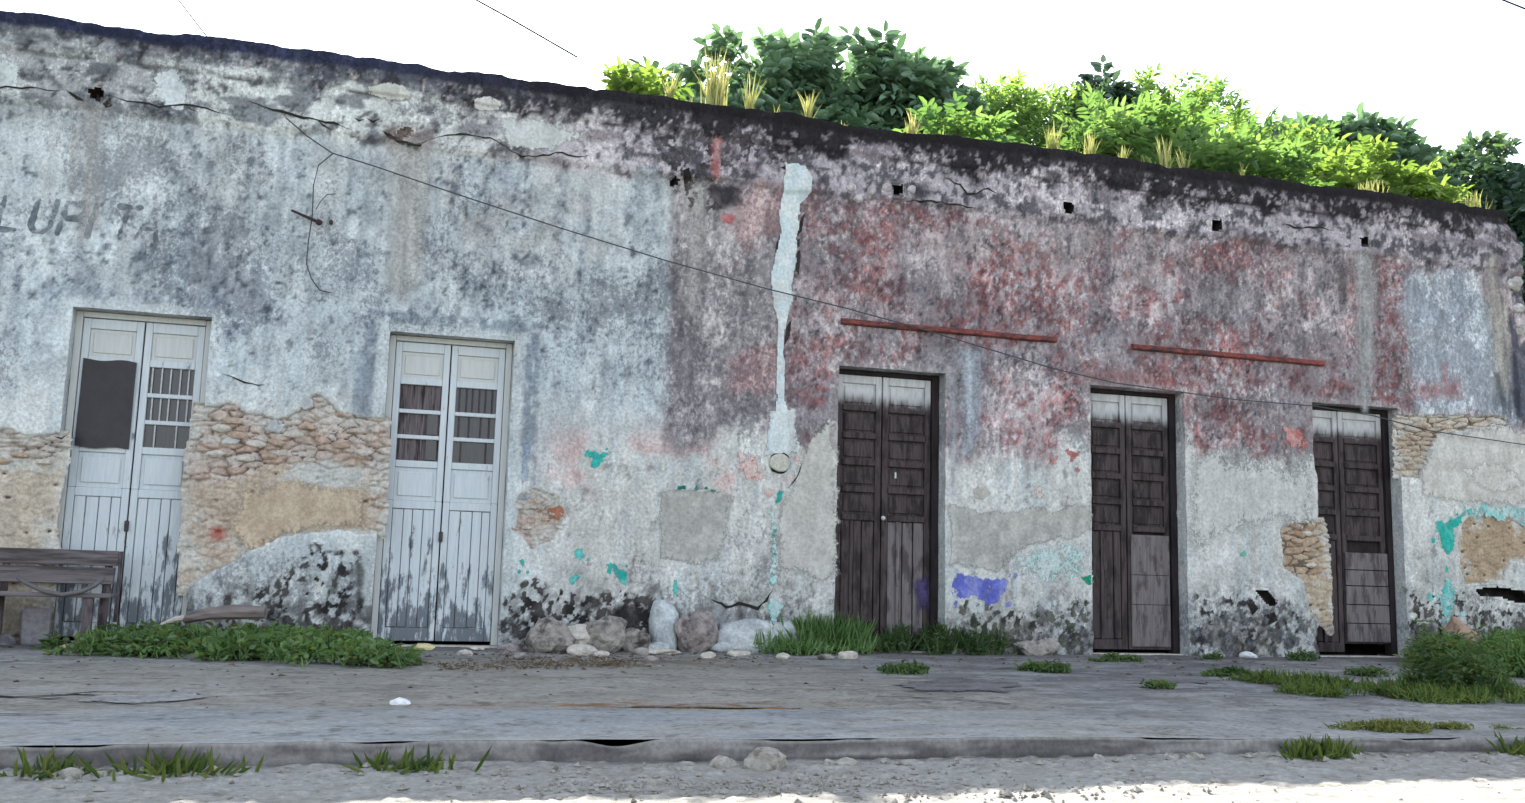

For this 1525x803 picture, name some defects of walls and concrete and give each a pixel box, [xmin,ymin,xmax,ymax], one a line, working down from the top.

crack [0,84,66,92]
crack [113,96,379,129]
peeling [585,448,609,469]
spalling [1392,412,1506,480]
spalling [0,428,73,643]
spalling [176,395,392,596]
spalling [512,443,570,574]
peeling [570,549,628,585]
spalling [1280,517,1335,636]
spalling [1427,503,1525,625]
leakage [499,578,656,645]
leakage [1194,593,1314,657]